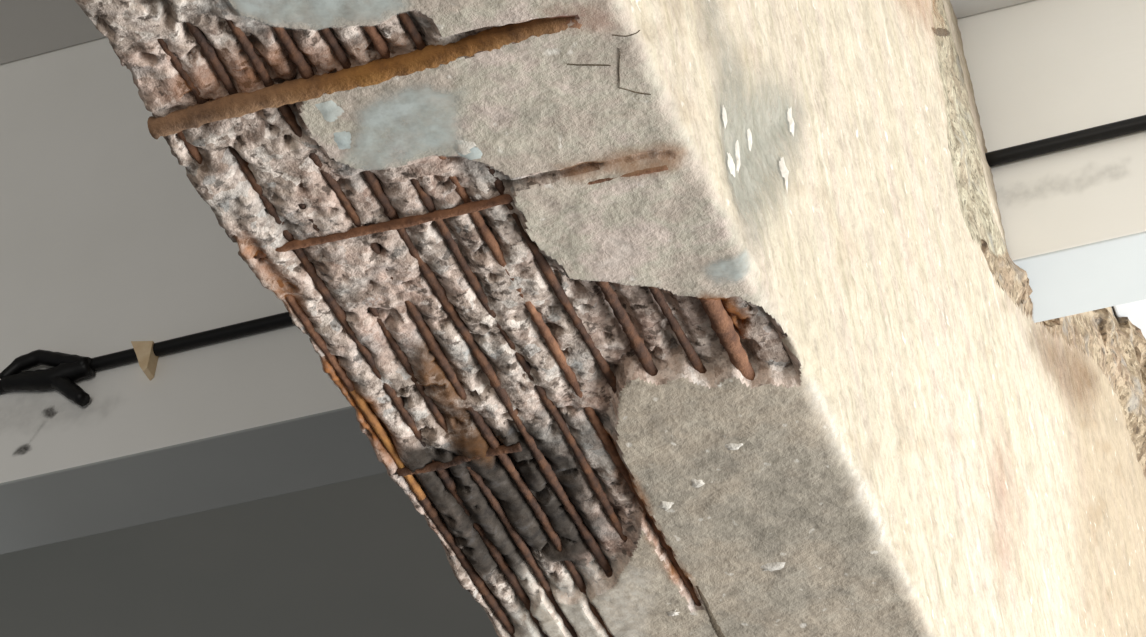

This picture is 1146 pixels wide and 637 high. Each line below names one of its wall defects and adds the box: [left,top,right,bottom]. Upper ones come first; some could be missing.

spalling [75,0,580,118]
spalling [931,0,1146,479]
rust [322,361,394,450]
rust [418,350,498,455]
spalling [163,88,802,637]
rust [709,298,747,332]
leakage [404,423,597,577]
crack [697,586,725,637]